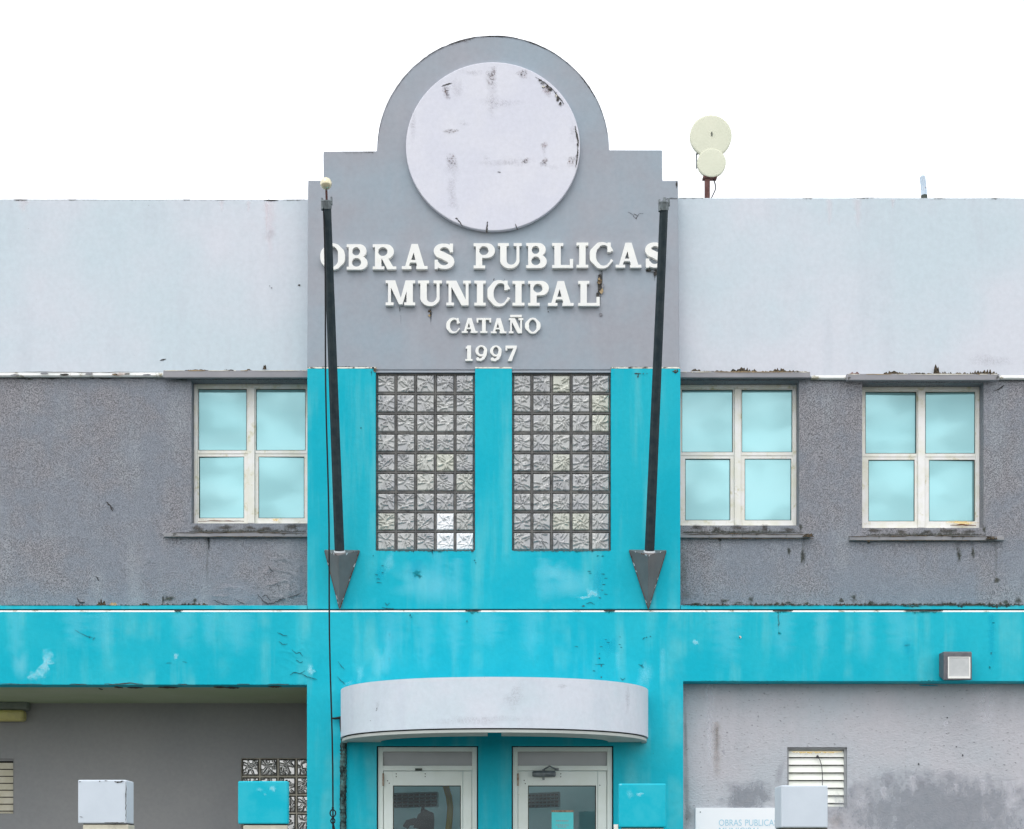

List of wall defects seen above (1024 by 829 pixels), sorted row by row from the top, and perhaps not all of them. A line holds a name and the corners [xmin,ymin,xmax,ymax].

damp [378,36,608,136]
damp [685,596,1023,634]
damp [851,782,1024,829]